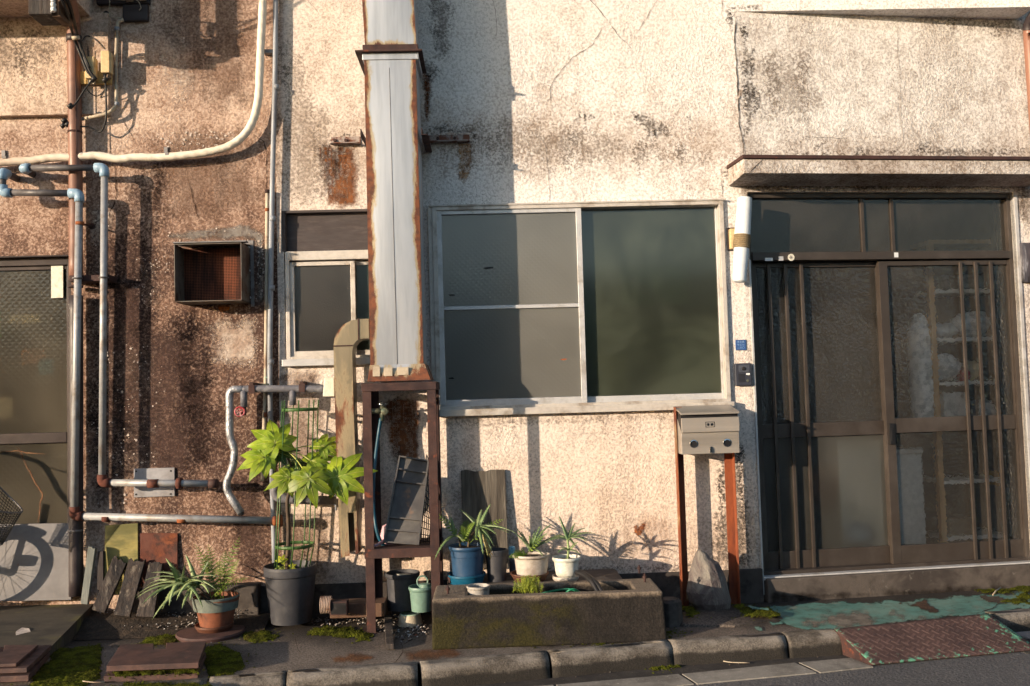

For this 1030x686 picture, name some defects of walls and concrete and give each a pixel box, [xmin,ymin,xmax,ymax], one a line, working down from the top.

crack [549,0,656,105]
crack [721,2,761,198]
leakage [741,52,758,136]
rust [319,145,357,206]
leakage [88,169,226,506]
rust [385,397,419,458]
leakage [713,447,749,565]